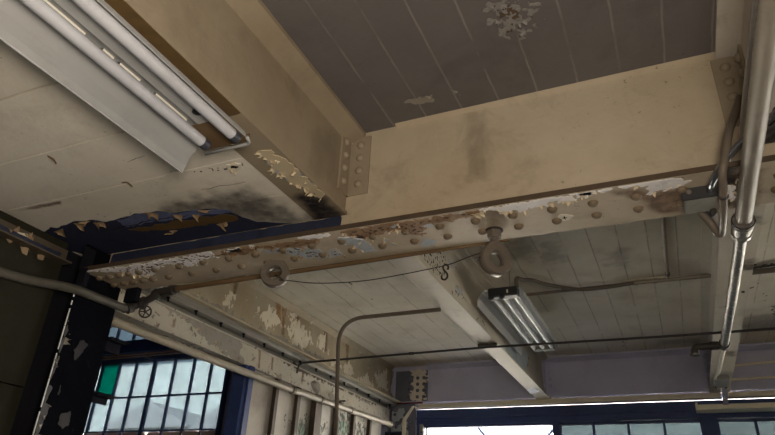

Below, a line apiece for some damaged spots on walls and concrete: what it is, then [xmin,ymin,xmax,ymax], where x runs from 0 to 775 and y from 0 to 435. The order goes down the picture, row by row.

peeling [254,150,325,202]
peeling [0,208,289,260]
peeling [88,177,692,284]
peeling [254,304,326,353]
peeling [35,320,88,435]
peeling [330,357,395,398]
peeling [409,368,429,401]